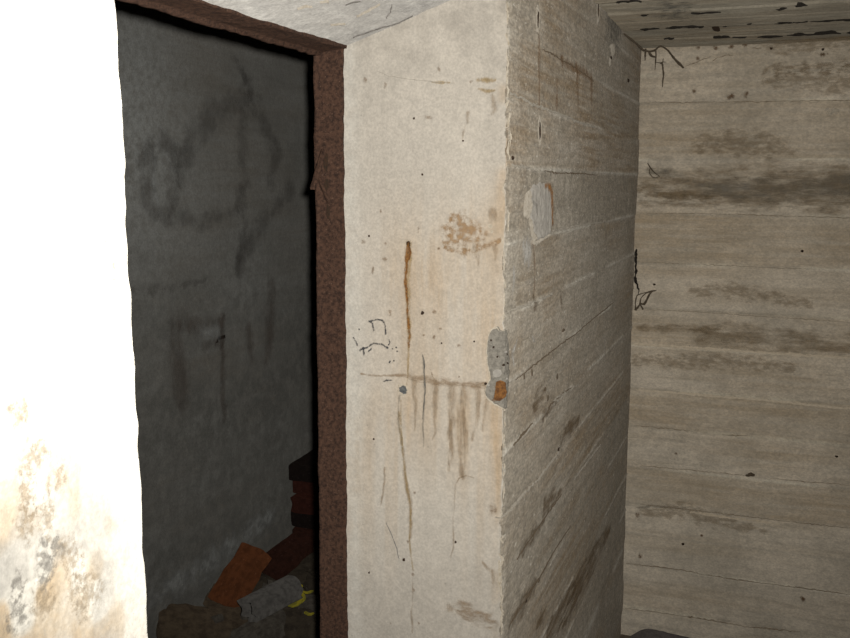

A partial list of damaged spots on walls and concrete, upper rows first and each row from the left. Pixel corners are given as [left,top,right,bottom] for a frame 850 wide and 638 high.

spalling [523,182,553,245]
corrosion [404,241,412,346]
crack [634,249,820,294]
spalling [484,212,510,448]
water stain [40,537,63,586]